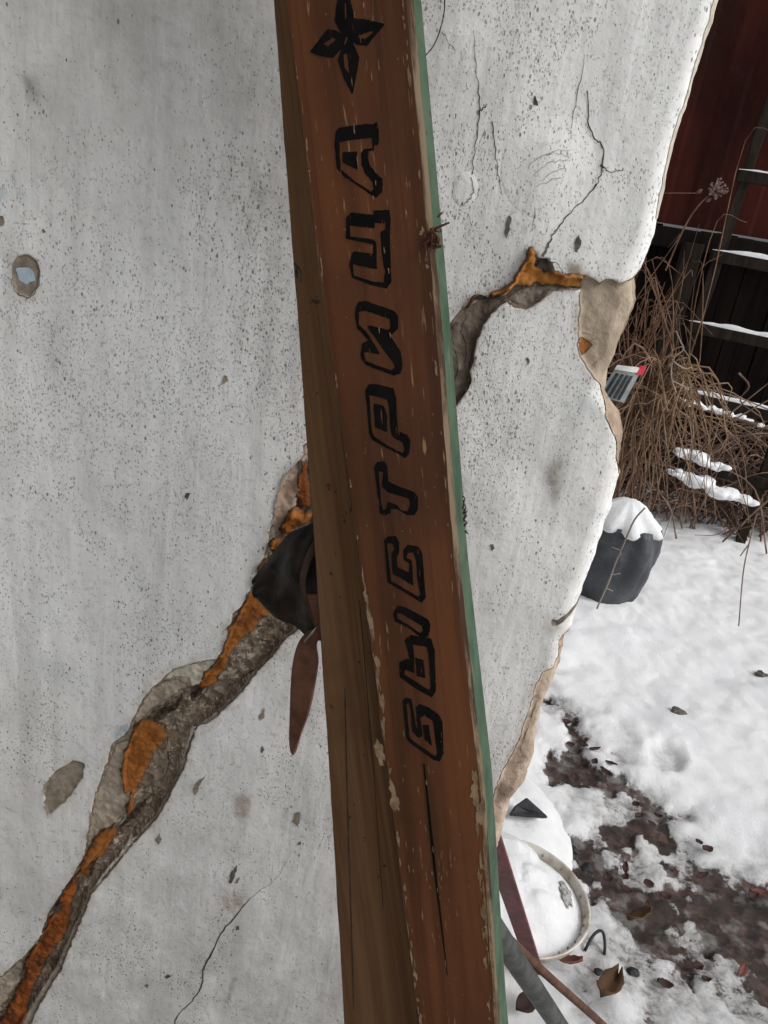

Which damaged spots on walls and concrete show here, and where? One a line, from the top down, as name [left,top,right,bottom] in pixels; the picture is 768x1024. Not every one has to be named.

crack [442,31,502,192]
flaking render [11,255,40,298]
crack [450,54,623,406]
flaking render [578,266,642,474]
flaking render [43,760,85,815]
crack [0,443,313,1024]
flaking render [470,594,581,1020]
peeling [396,830,455,1024]